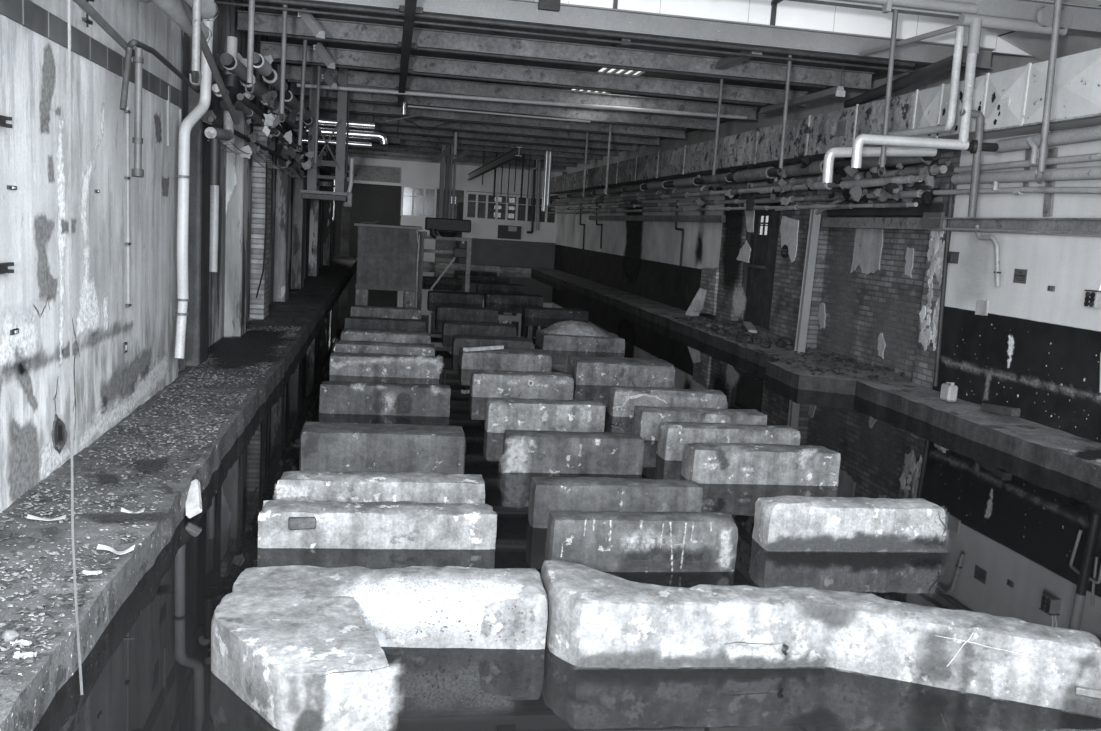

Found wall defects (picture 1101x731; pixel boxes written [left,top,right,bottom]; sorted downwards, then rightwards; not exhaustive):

damp [0,103,133,410]
peeling [918,231,946,351]
damp [9,350,168,500]
damp [82,512,170,522]